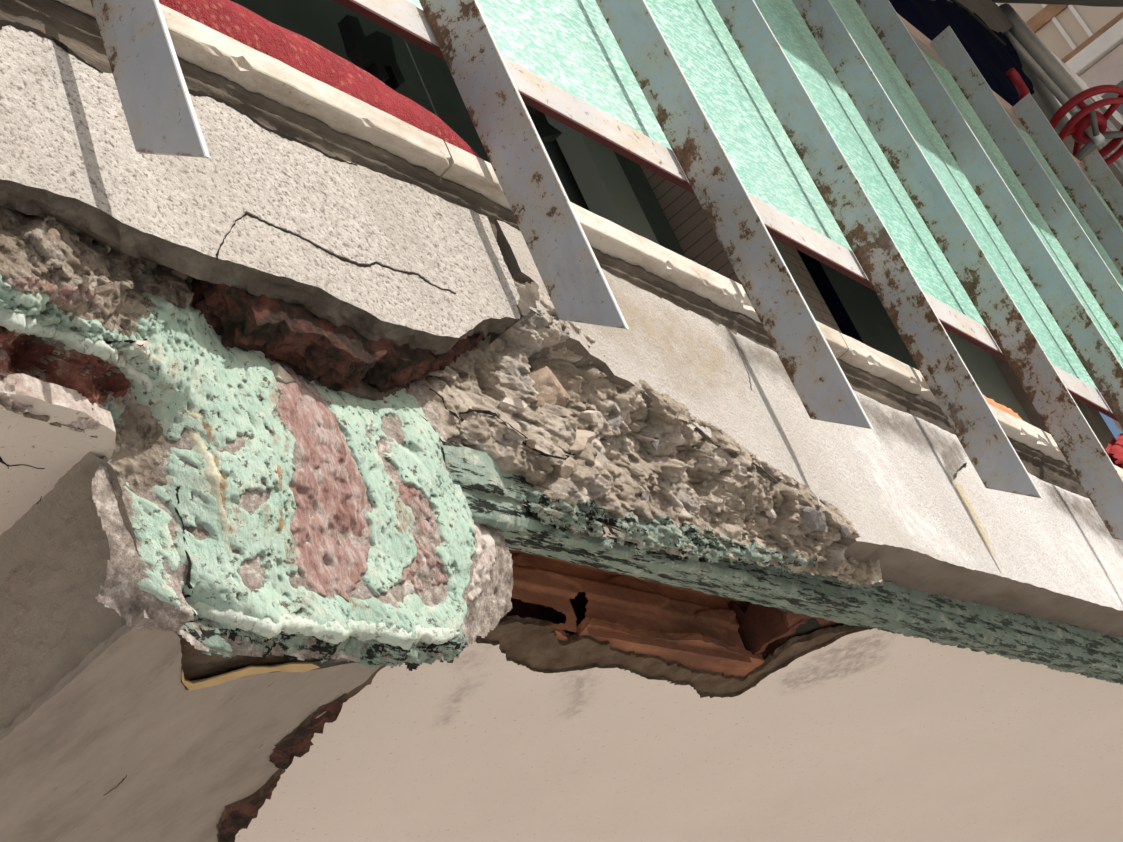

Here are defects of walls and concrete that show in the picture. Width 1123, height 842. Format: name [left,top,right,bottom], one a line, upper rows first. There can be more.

corrosion [1026,4,1068,33]
corrosion [1061,12,1123,63]
crack [216,211,456,294]
crack [0,457,44,469]
peeling [0,206,883,695]
flaking render [216,693,347,842]